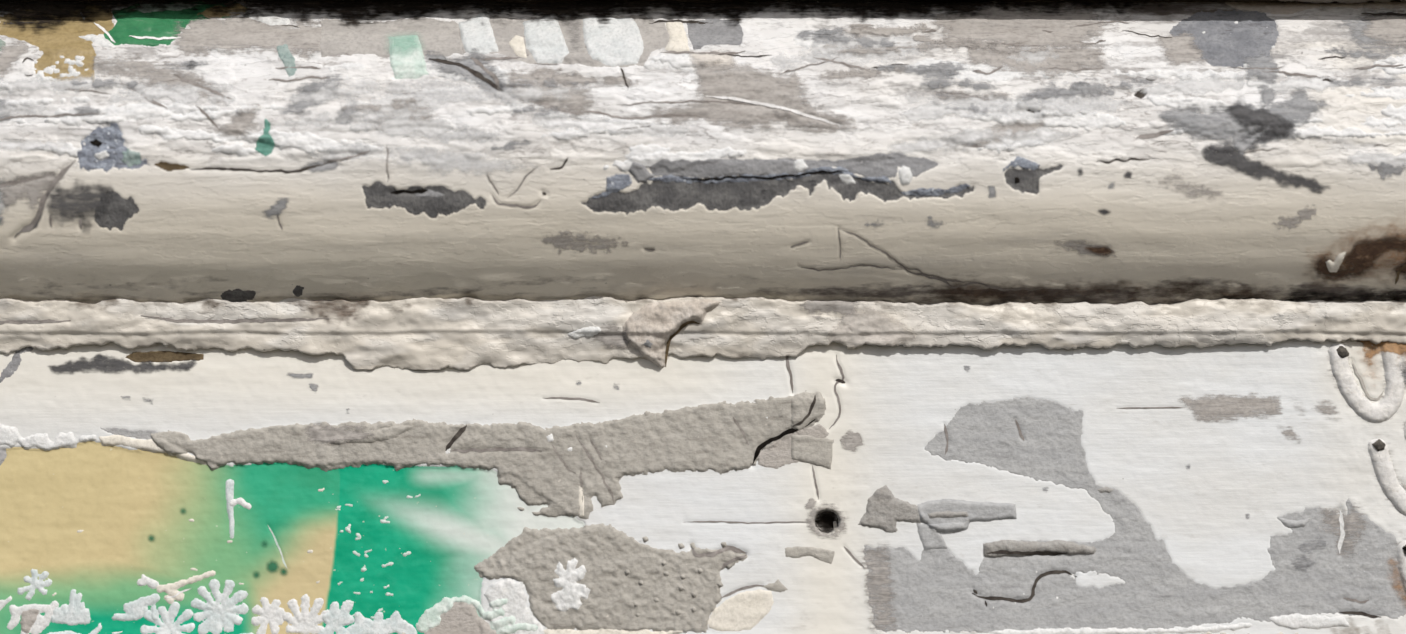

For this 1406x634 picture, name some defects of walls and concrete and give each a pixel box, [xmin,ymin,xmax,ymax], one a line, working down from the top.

peeling [0,1,1127,231]
peeling [1114,9,1406,168]
crack [801,228,1037,291]
corrosion [1316,233,1406,284]
crack [752,355,845,465]
peeling [0,424,683,634]
crack [693,466,819,524]
crack [844,546,865,568]